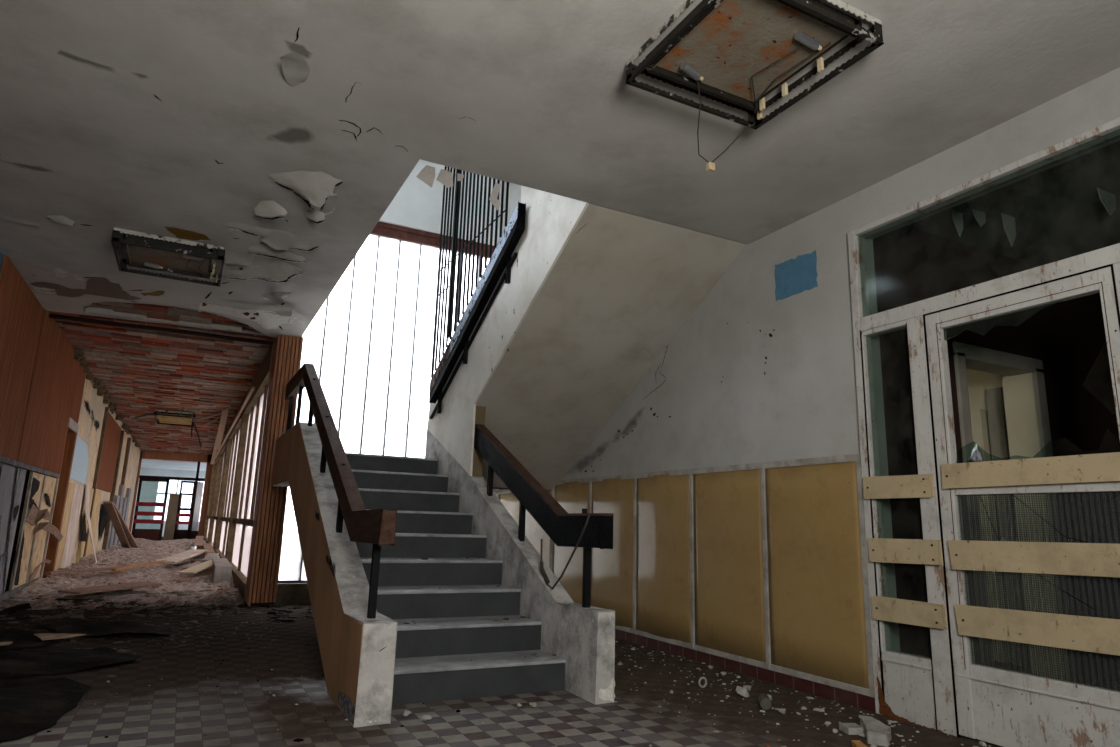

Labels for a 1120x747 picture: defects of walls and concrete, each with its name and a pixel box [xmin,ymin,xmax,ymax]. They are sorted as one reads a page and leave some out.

peeling [267,170,343,224]
peeling [83,200,319,336]